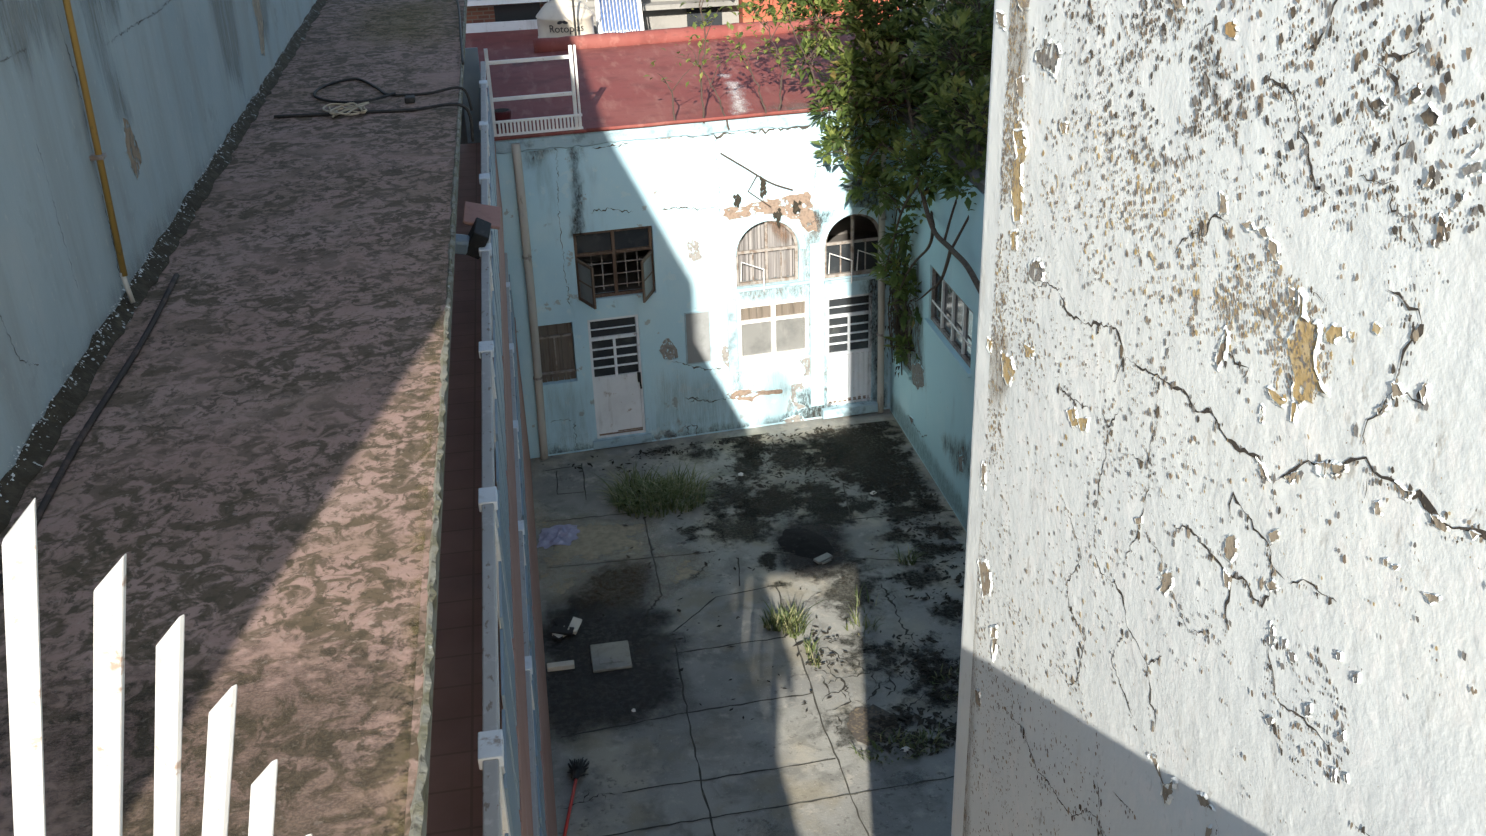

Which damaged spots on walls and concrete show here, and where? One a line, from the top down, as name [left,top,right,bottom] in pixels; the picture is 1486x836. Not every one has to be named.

spalling [722,191,817,233]
peeling [0,0,310,502]
spalling [658,337,679,361]
damp [767,371,837,424]
spalling [911,362,925,391]
peeling [958,0,1485,836]
crack [1039,282,1486,759]